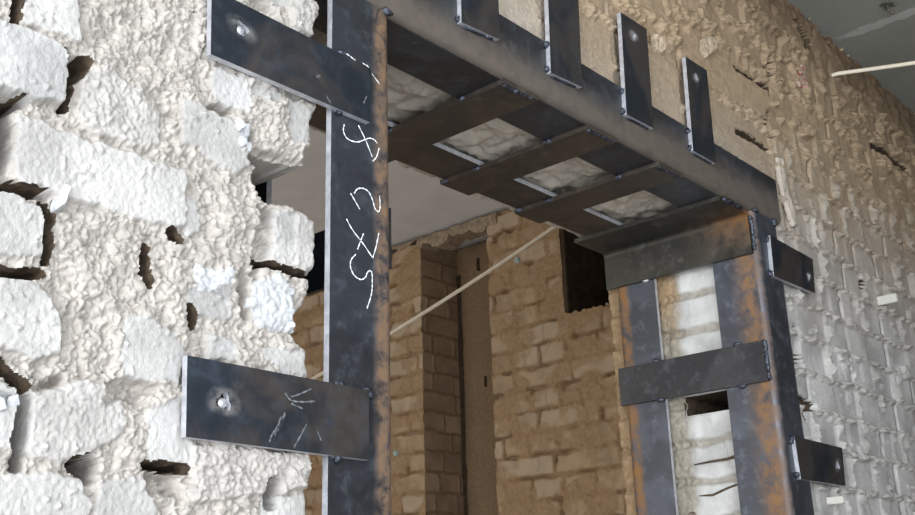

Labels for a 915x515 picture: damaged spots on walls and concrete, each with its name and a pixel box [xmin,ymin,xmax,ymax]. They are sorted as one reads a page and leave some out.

spalling [234,117,252,153]
crack [870,142,908,173]
spalling [49,184,72,214]
spalling [193,263,236,292]
spalling [243,273,296,334]
spalling [0,391,20,412]